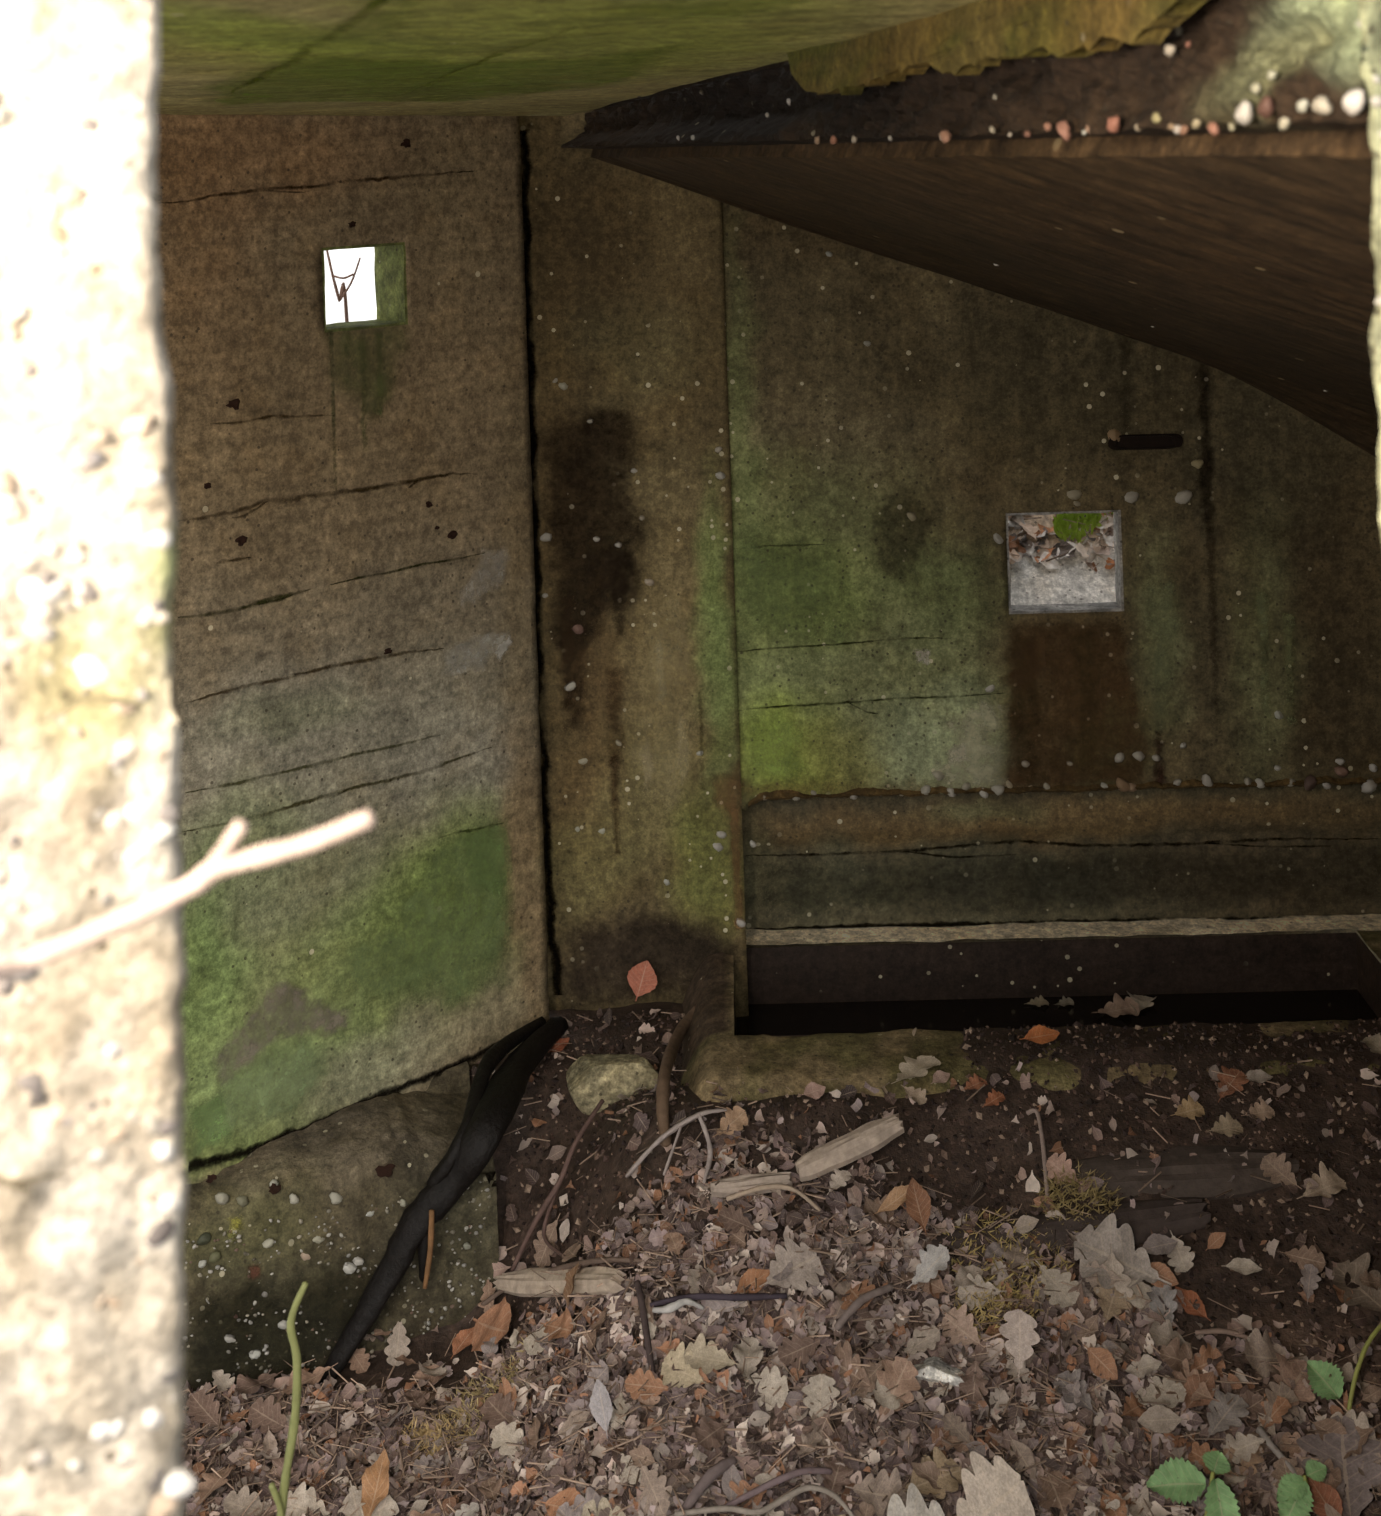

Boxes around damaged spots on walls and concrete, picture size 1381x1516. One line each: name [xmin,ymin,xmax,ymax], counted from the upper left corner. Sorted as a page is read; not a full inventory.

spalling [561,0,1381,149]
crack [163,171,473,203]
crack [215,415,323,424]
crack [196,472,469,520]
crack [178,552,485,618]
crack [520,124,562,995]
leakage [546,411,643,724]
crack [191,648,444,702]
crack [186,736,492,813]
crack [747,838,1377,858]
leakage [574,921,718,1002]